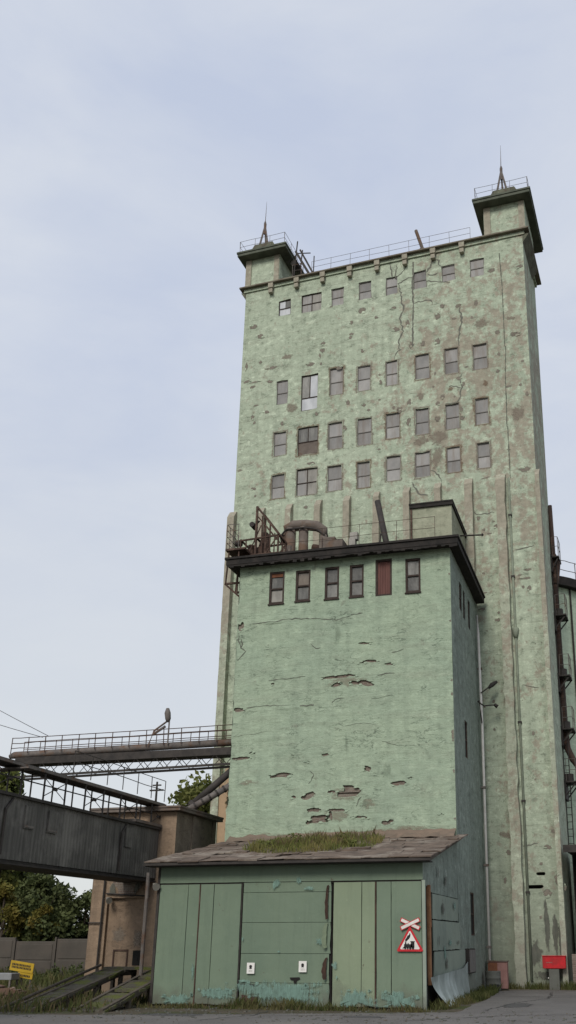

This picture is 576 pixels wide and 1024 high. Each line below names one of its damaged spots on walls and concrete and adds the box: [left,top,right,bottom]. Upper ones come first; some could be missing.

crack [390,259,450,359]
crack [456,307,464,345]
crack [446,374,463,404]
spalling [321,660,396,687]
spalling [290,785,425,829]
peeling [161,964,319,1004]
peeling [340,989,420,1007]